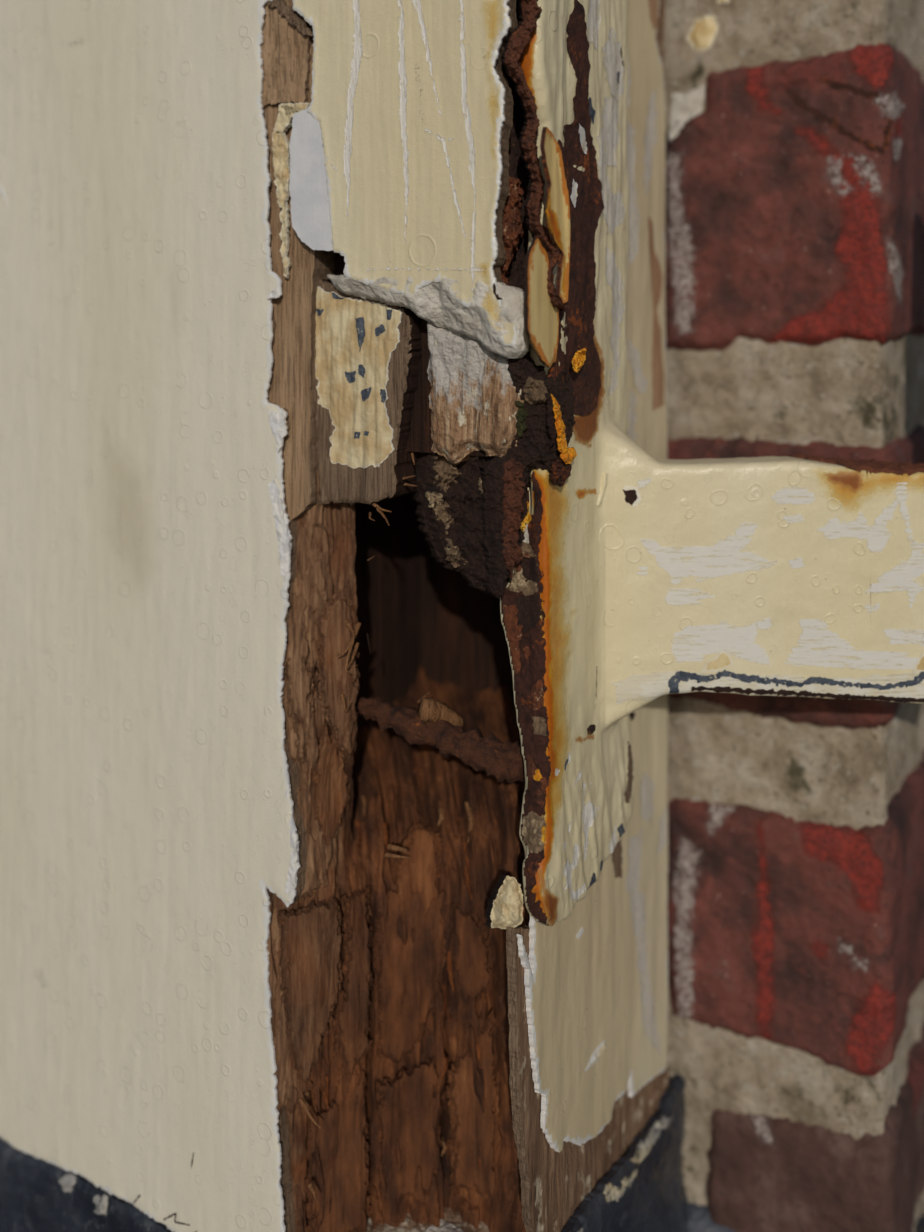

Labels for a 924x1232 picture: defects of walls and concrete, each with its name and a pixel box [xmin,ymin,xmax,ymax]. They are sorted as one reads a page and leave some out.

peeling [261,0,333,278]
spalling [314,127,571,596]
peeling [268,411,288,453]
peeling [268,479,291,581]
corrosion [479,0,605,926]
peeling [622,486,642,507]
corrosion [777,453,924,505]
spalling [418,697,463,727]
peeling [668,670,924,694]
peeling [285,818,299,894]